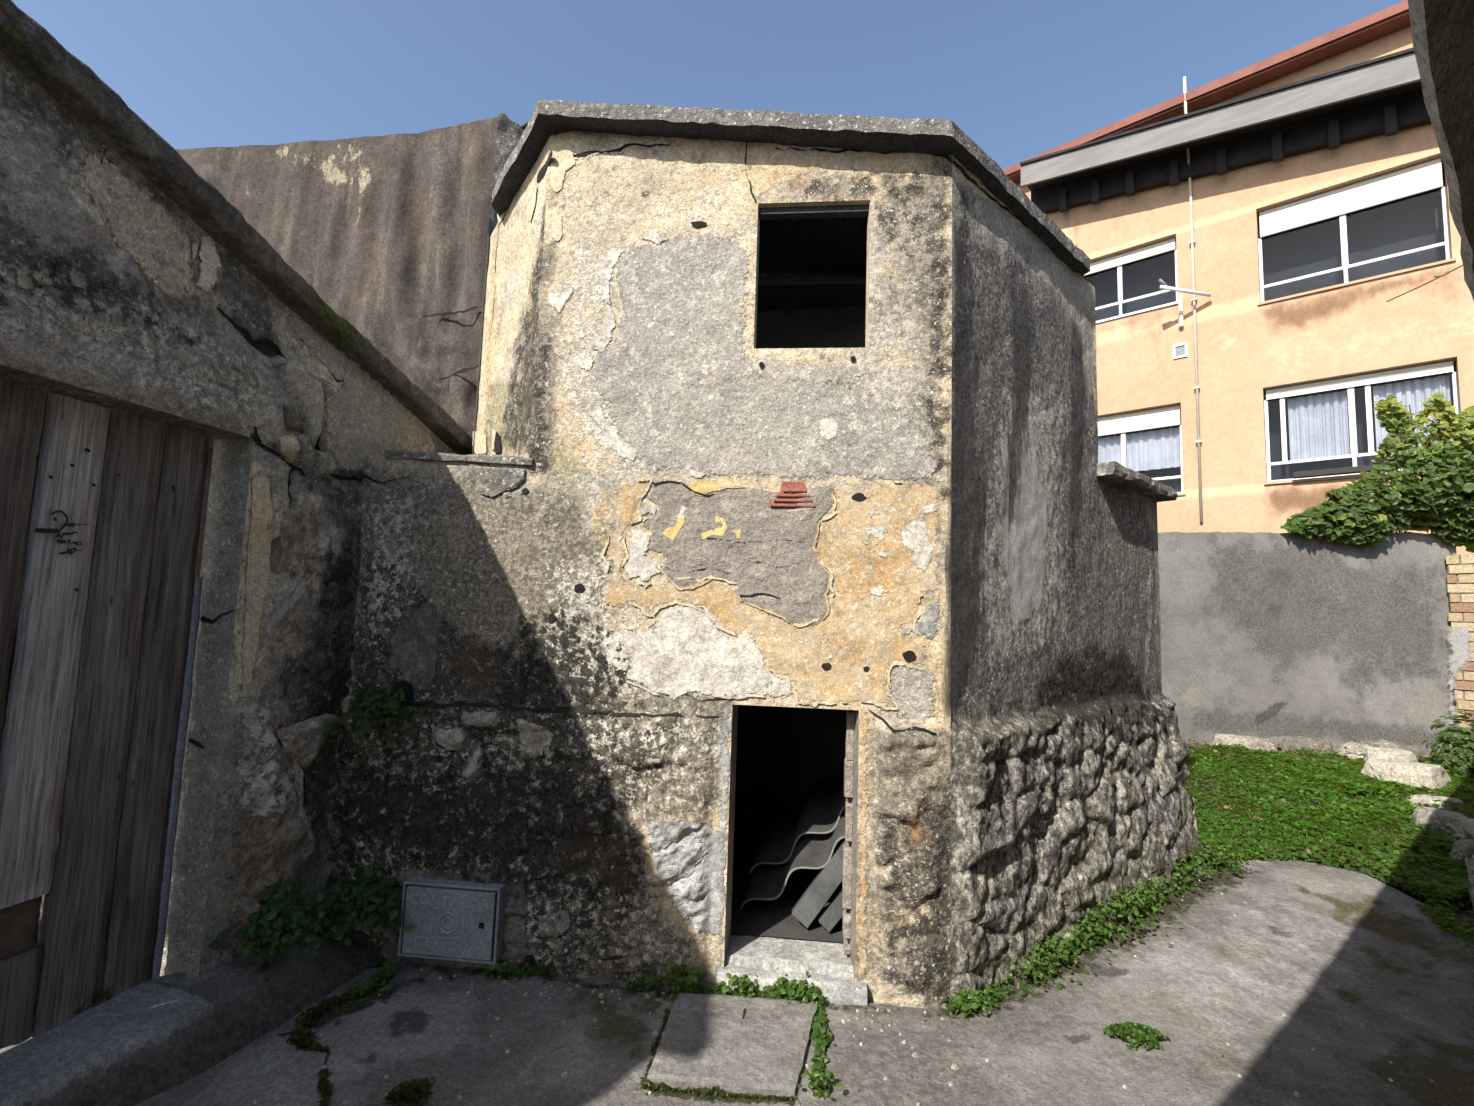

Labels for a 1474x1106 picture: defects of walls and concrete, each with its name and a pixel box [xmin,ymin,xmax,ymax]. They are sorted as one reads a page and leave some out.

flaking render [526,147,575,221]
crack [537,139,676,182]
flaking render [546,286,573,315]
crack [217,307,410,508]
flaking render [577,230,940,710]
water stain [938,237,1048,714]
water stain [1070,320,1085,541]
water stain [459,607,642,714]
crack [406,693,728,752]
water stain [1038,646,1168,740]
water stain [327,724,655,908]